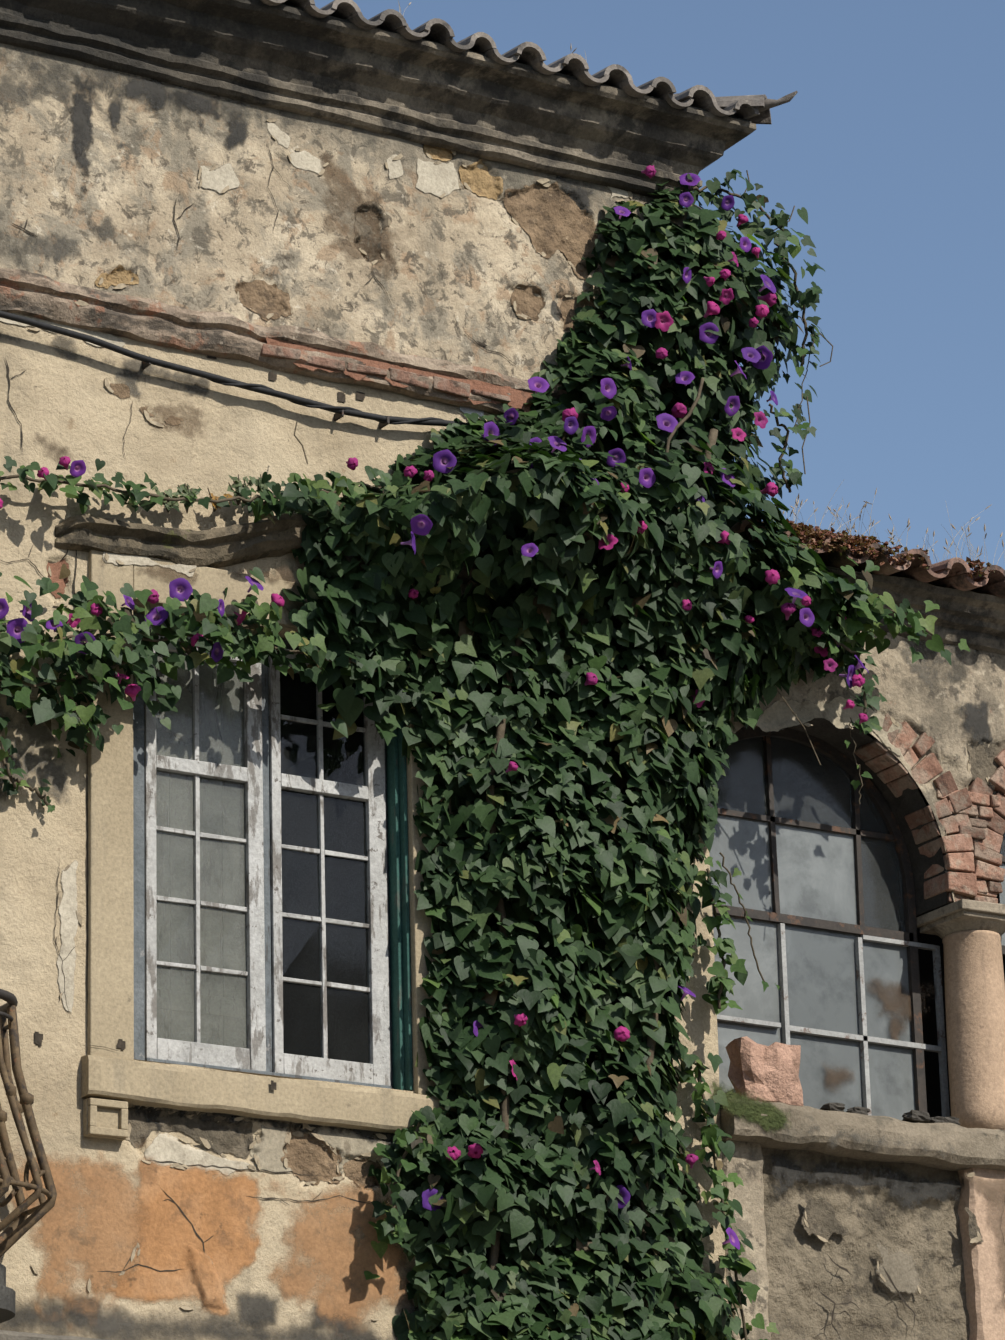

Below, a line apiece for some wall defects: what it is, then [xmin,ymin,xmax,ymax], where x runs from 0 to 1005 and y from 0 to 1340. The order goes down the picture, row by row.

water stain [0,54,259,192]
spalling [354,201,392,265]
spalling [385,144,598,280]
spalling [235,280,293,321]
spalling [511,284,605,332]
peeling [56,860,82,1013]
peeling [12,1106,407,1322]
crack [97,1160,370,1273]
spalling [876,1244,921,1294]